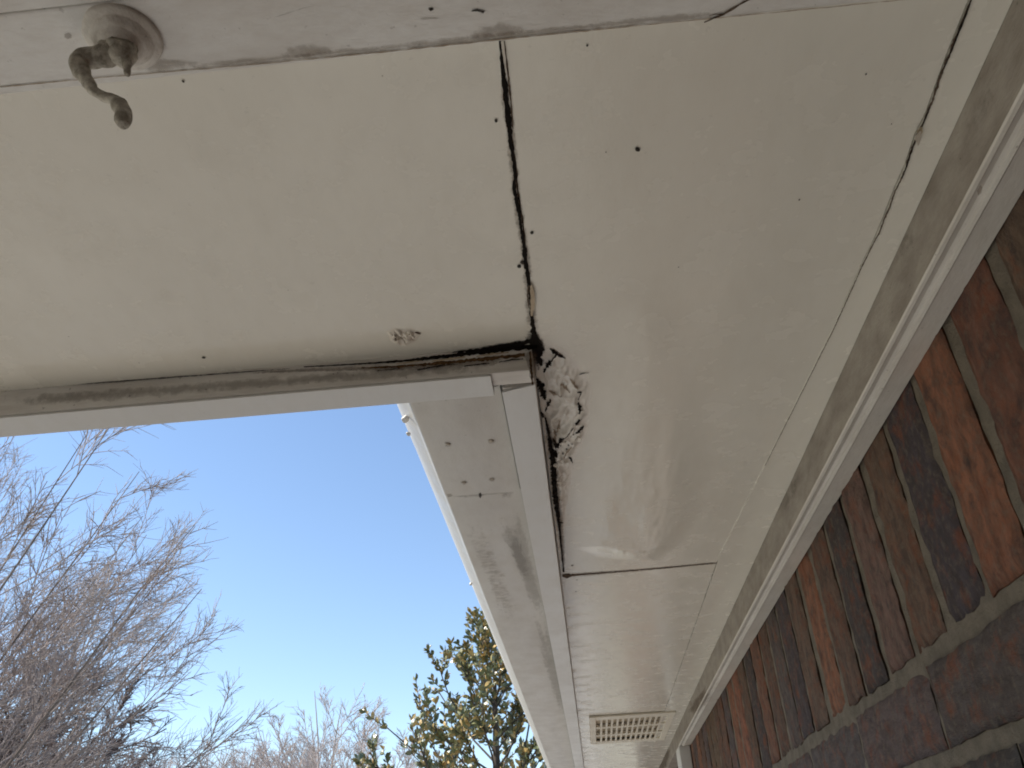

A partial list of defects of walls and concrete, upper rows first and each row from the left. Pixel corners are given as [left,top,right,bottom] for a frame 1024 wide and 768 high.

crack [1,0,898,333]
crack [765,0,972,465]
peeling [417,344,591,560]